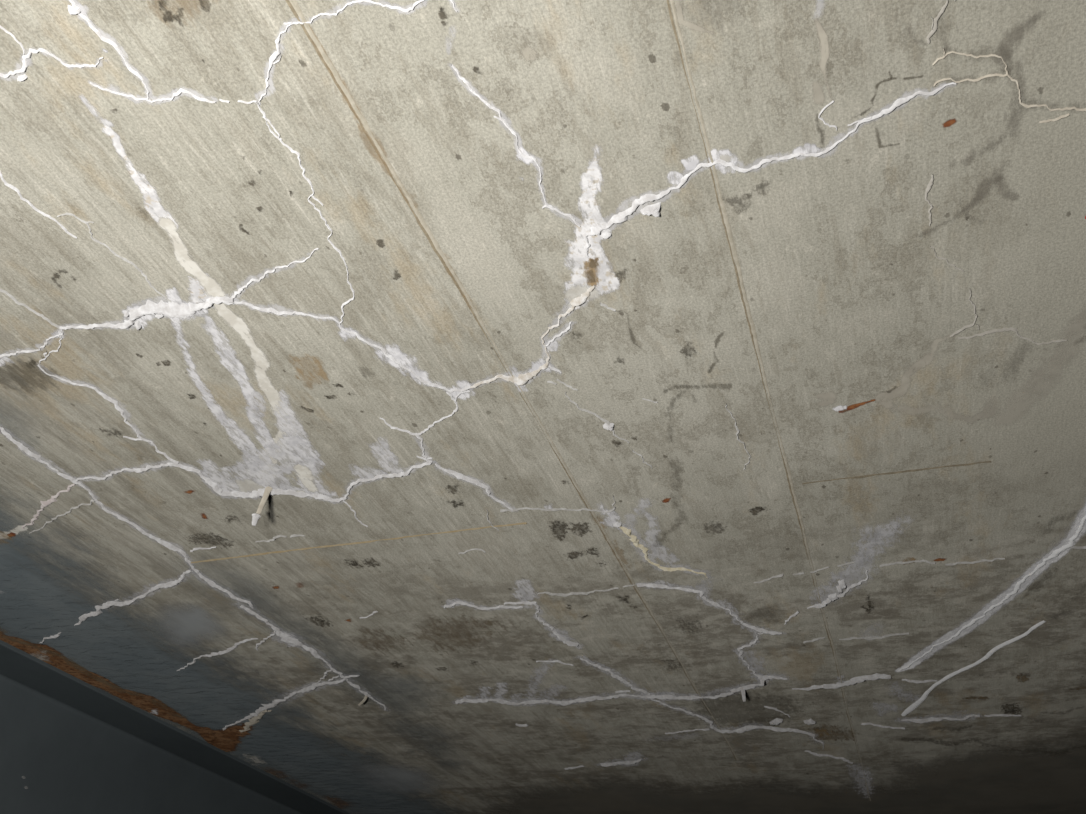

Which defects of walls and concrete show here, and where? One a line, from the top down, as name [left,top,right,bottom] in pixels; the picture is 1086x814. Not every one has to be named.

water stain [81,97,336,496]
crack [0,0,1086,626]
corrosion [833,399,875,413]
corrosion [0,484,76,539]
crack [40,632,62,643]
corrosion [0,631,216,743]
crack [177,638,258,671]
crack [222,605,387,732]
crack [444,579,853,764]
crack [803,632,909,643]
crack [861,714,1021,729]
crack [564,752,641,770]